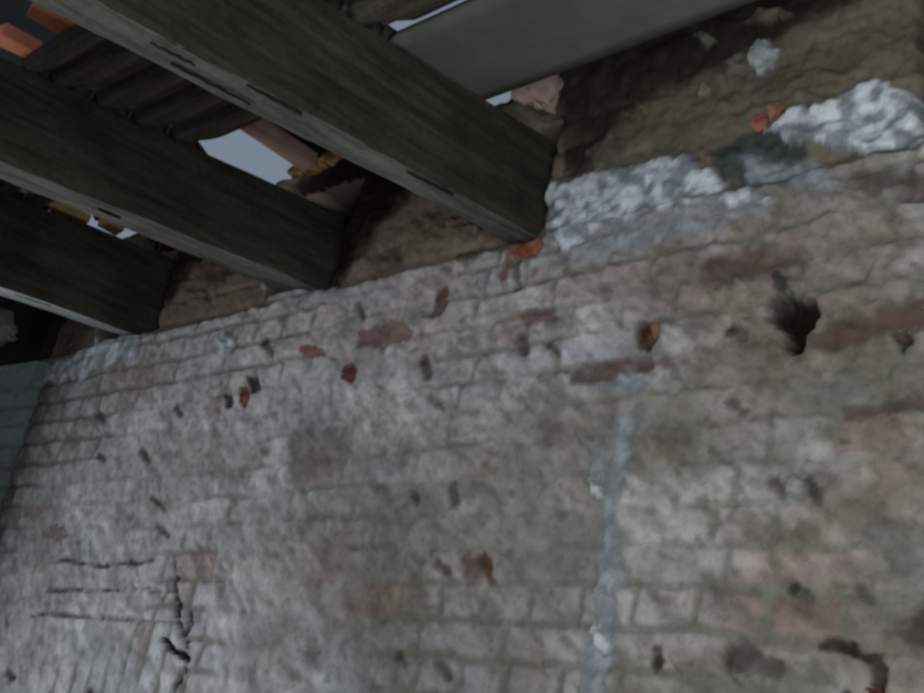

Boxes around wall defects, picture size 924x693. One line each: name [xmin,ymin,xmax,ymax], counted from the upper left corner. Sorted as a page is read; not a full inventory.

crack [33,558,152,618]
crack [146,566,194,693]